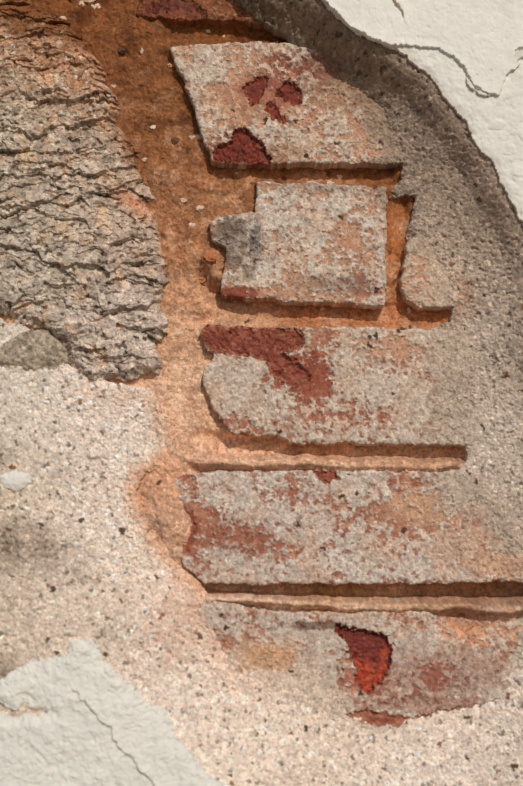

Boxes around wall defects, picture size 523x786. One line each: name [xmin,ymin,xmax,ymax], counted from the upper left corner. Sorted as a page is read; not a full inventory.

spalling [138,0,212,21]
spalling [241,76,302,125]
flaking render [322,0,523,225]
spalling [213,127,272,165]
spalling [200,324,311,387]
flaking render [0,471,32,491]
spalling [313,470,340,484]
spalling [334,623,392,694]
spalling [345,704,478,728]
crack [85,703,154,786]